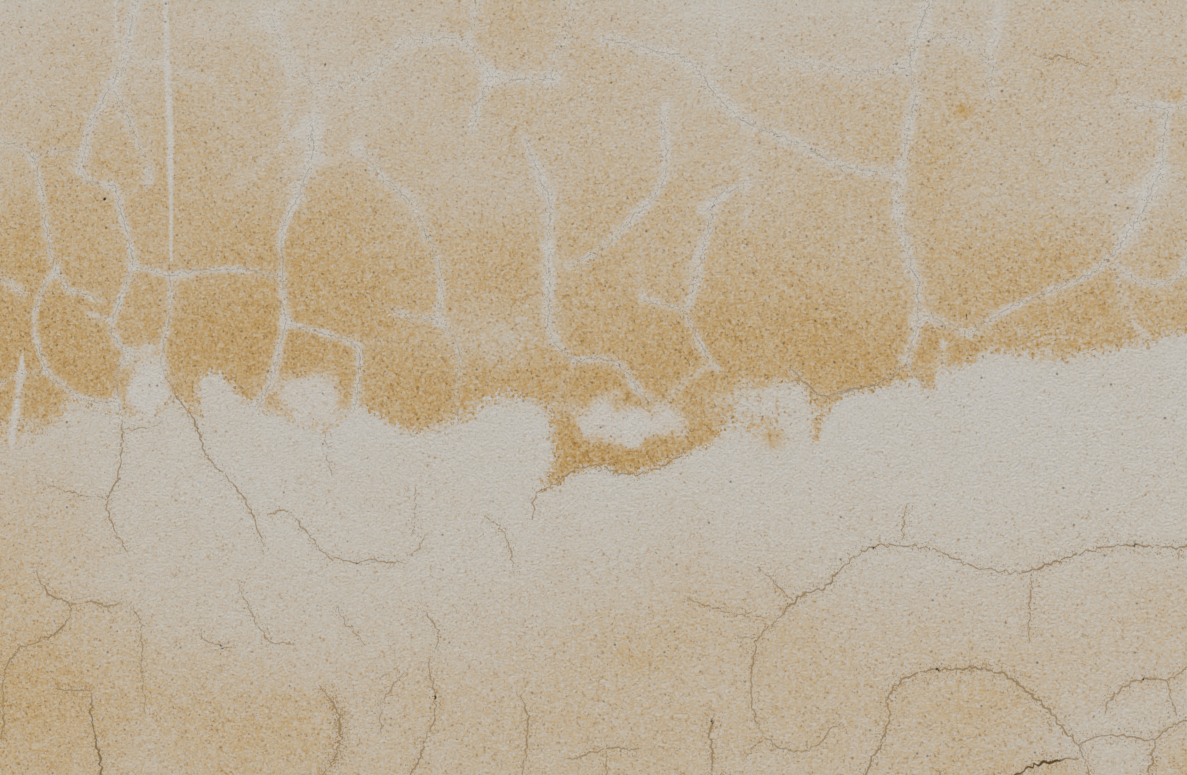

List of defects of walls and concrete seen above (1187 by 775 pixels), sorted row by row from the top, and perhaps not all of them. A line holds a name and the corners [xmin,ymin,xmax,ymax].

leakage [5,344,29,455]
leakage [131,0,271,270]
crack [0,0,427,571]
leakage [59,58,1187,634]
crack [484,115,768,577]
crack [789,362,908,404]
leakage [920,0,1187,314]
crack [0,570,150,749]
crack [53,679,109,775]
crack [309,595,445,775]
leakage [0,473,1187,775]
crack [684,505,1187,775]